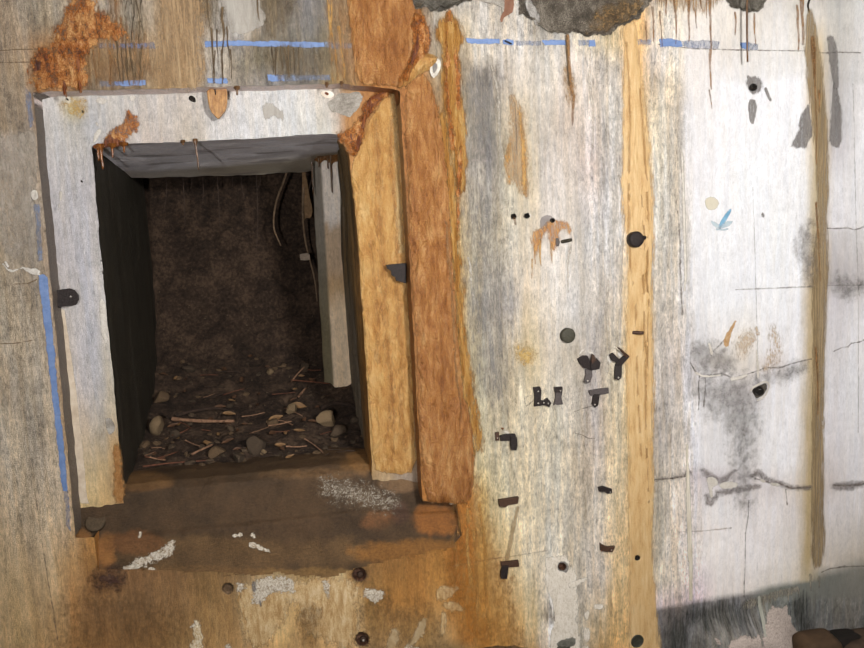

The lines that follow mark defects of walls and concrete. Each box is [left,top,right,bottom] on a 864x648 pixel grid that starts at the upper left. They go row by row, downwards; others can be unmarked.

spalling [413,0,652,37]
spalling [727,0,767,12]
corrosion [27,0,151,95]
corrosion [93,110,139,149]
corrosion [314,0,485,504]
corrosion [531,220,571,266]
water stain [620,21,758,648]
crack [833,481,864,490]
crack [654,470,810,556]